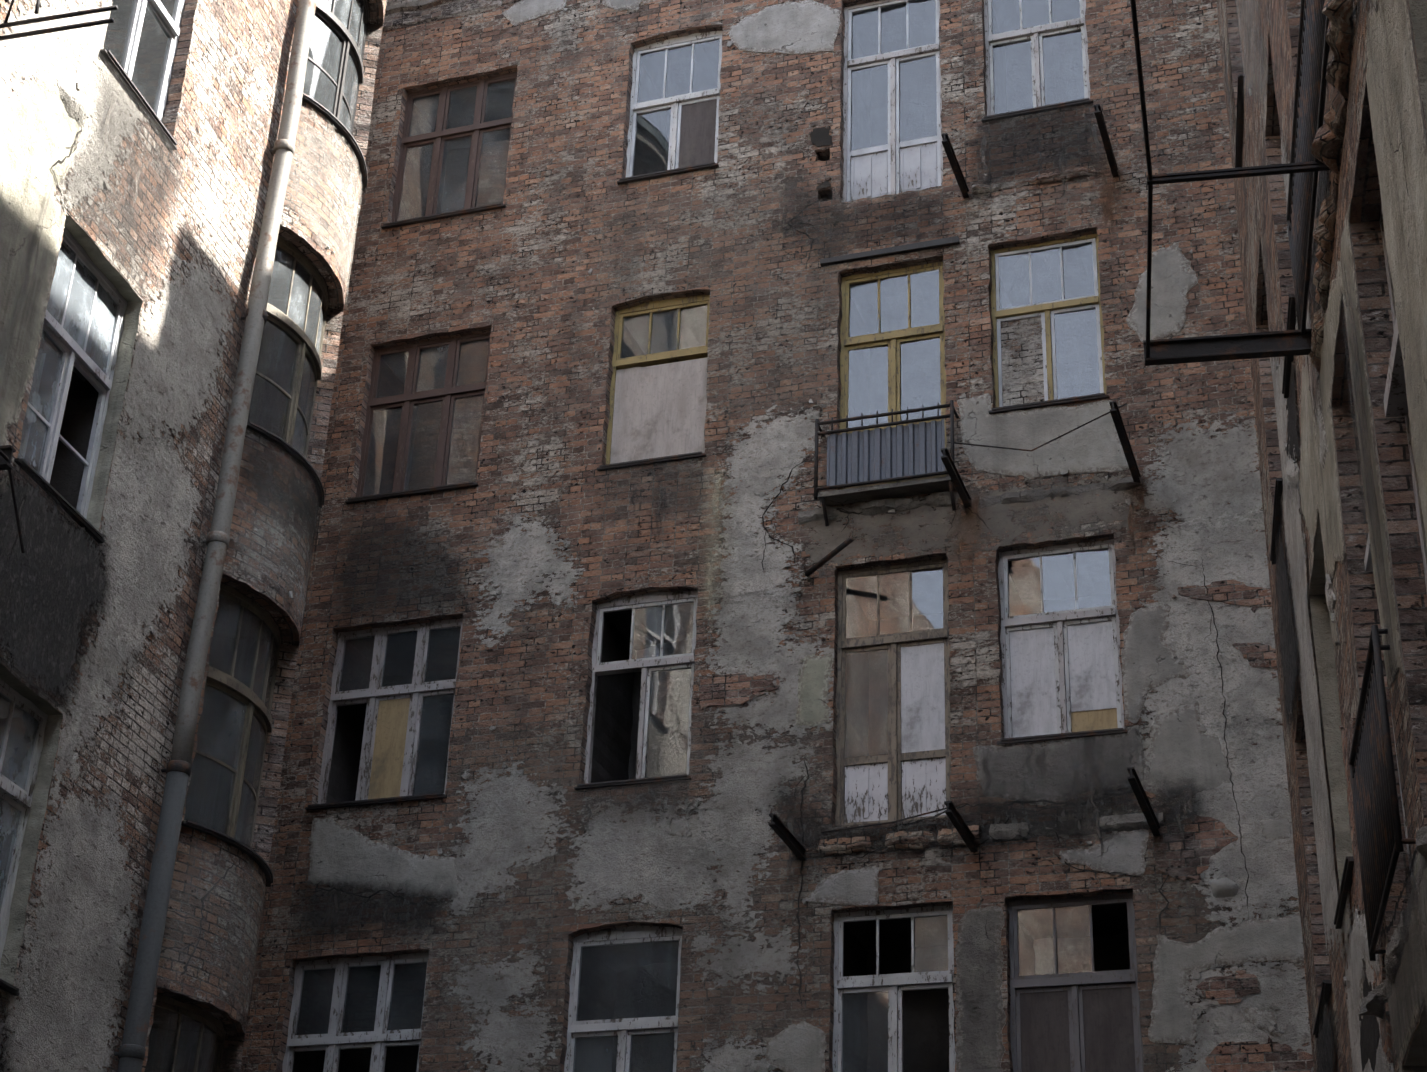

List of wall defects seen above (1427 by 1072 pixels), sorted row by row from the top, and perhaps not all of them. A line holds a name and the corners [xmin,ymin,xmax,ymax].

peeling [1280,129,1290,236]
peeling [437,399,1314,1072]
crack [1169,559,1249,914]
peeling [1270,355,1395,1072]